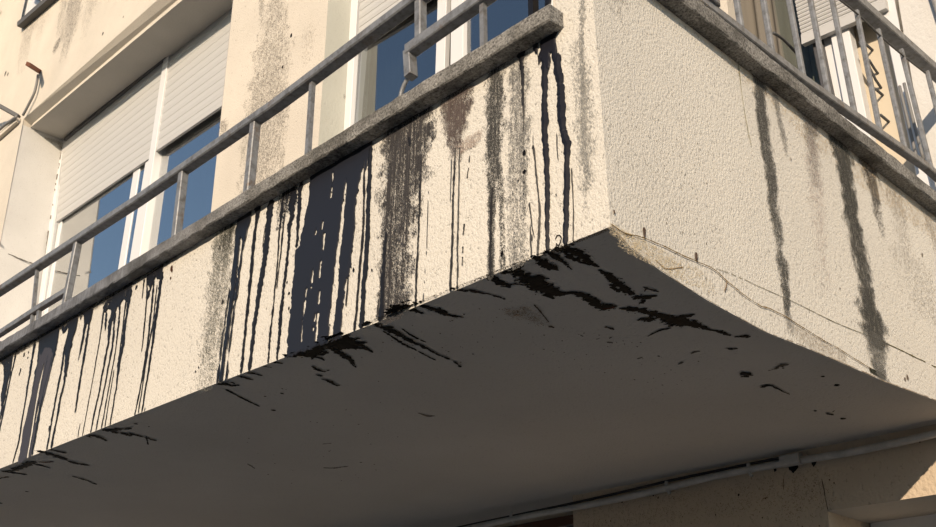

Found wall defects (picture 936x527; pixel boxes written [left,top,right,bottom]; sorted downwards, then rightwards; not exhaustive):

leakage [243,0,317,117]
crack [0,147,62,264]
leakage [256,105,290,184]
leakage [439,51,532,280]
leakage [720,50,936,383]
leakage [196,221,236,394]
crack [611,224,936,369]